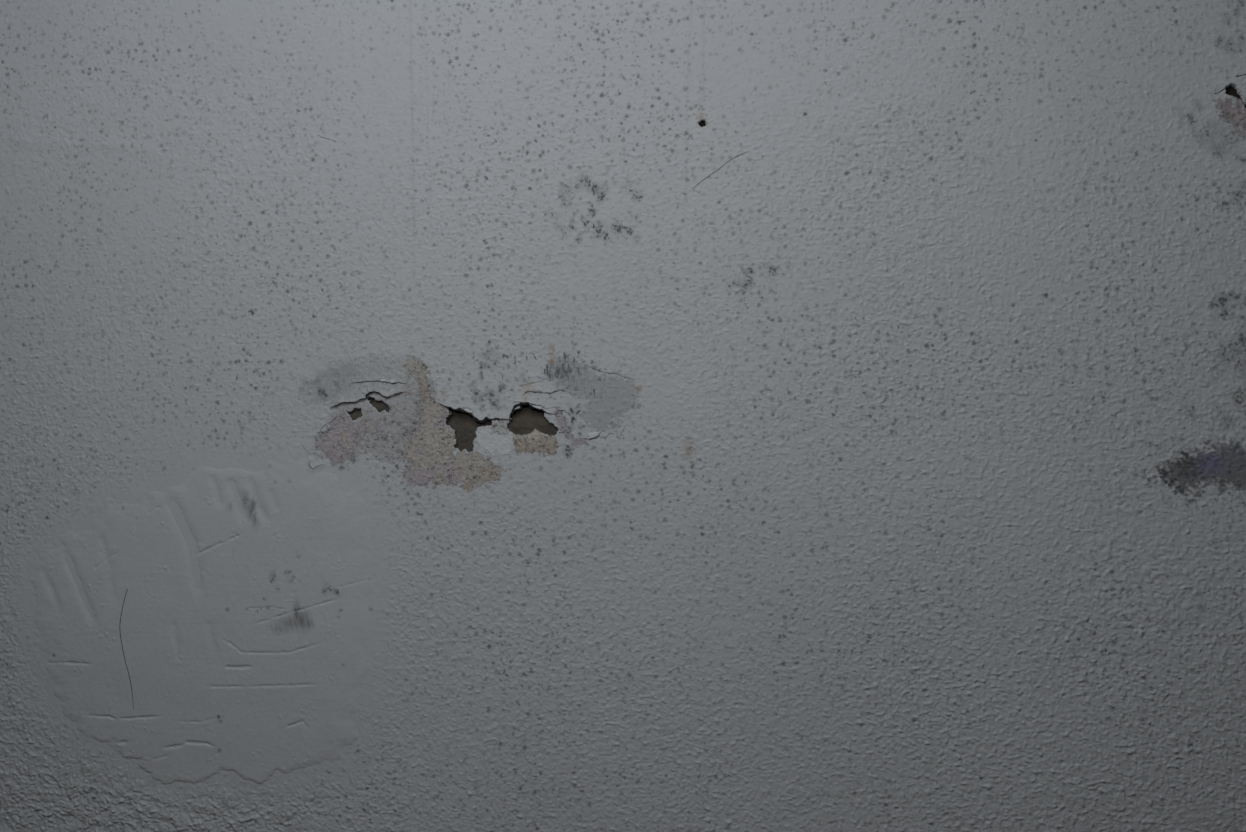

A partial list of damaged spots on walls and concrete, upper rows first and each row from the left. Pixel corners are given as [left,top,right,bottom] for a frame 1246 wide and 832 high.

peeling [1214,86,1246,139]
peeling [314,352,601,492]
leakage [1148,442,1246,502]